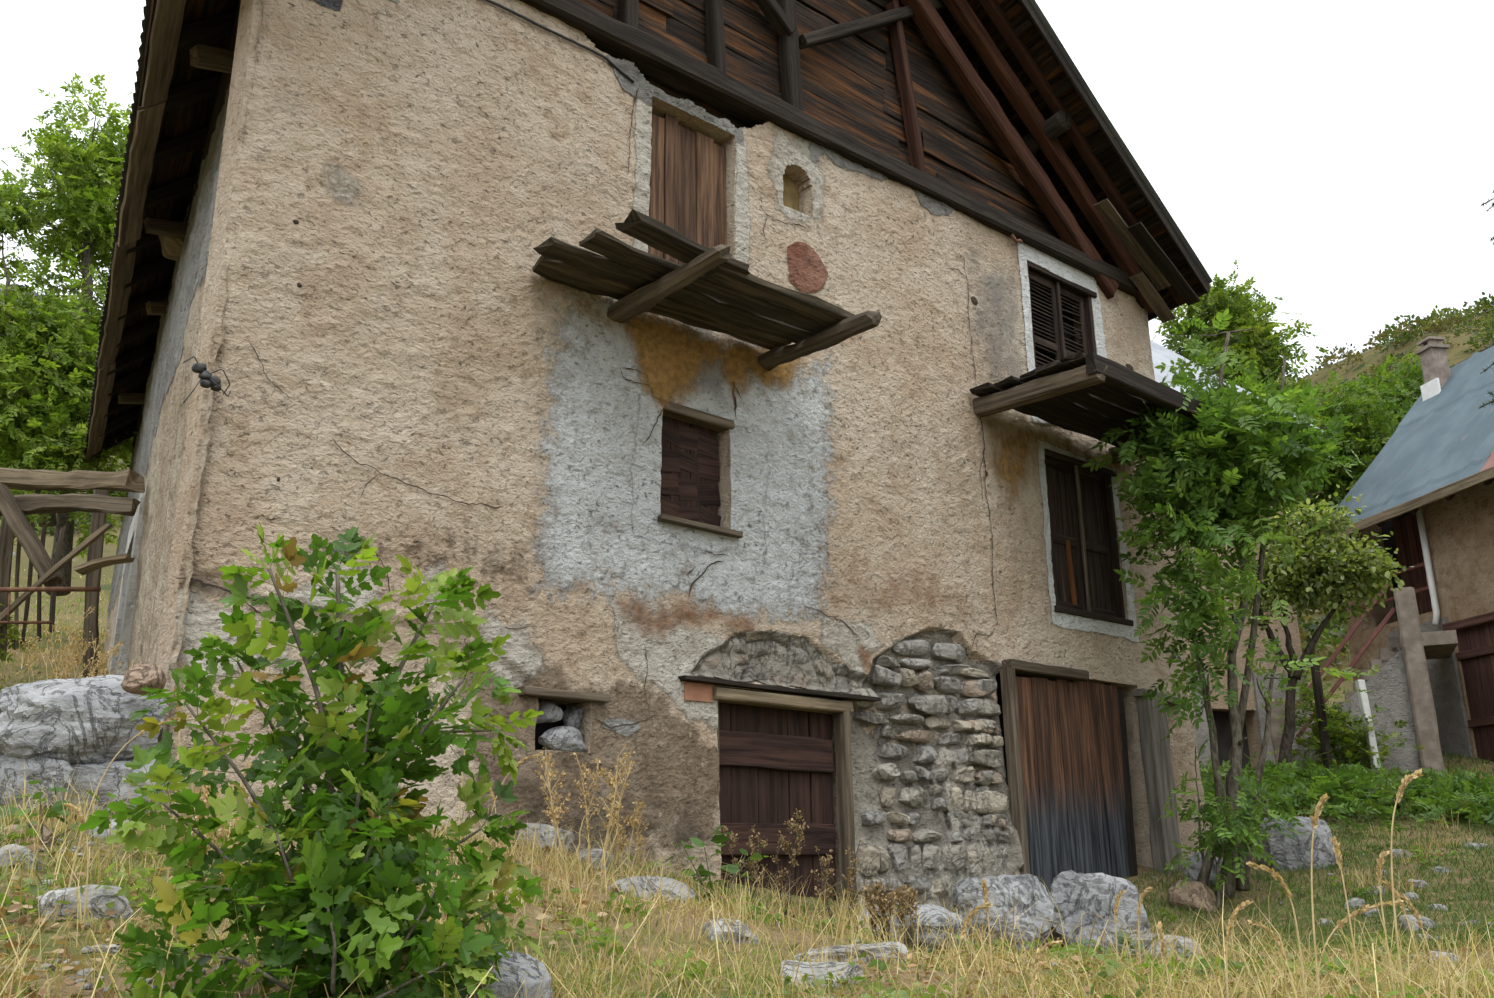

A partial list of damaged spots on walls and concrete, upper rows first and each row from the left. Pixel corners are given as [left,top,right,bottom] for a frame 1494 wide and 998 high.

water stain [625,314,799,407]
crack [333,439,506,509]
crack [949,258,998,649]
flaking render [176,589,260,678]